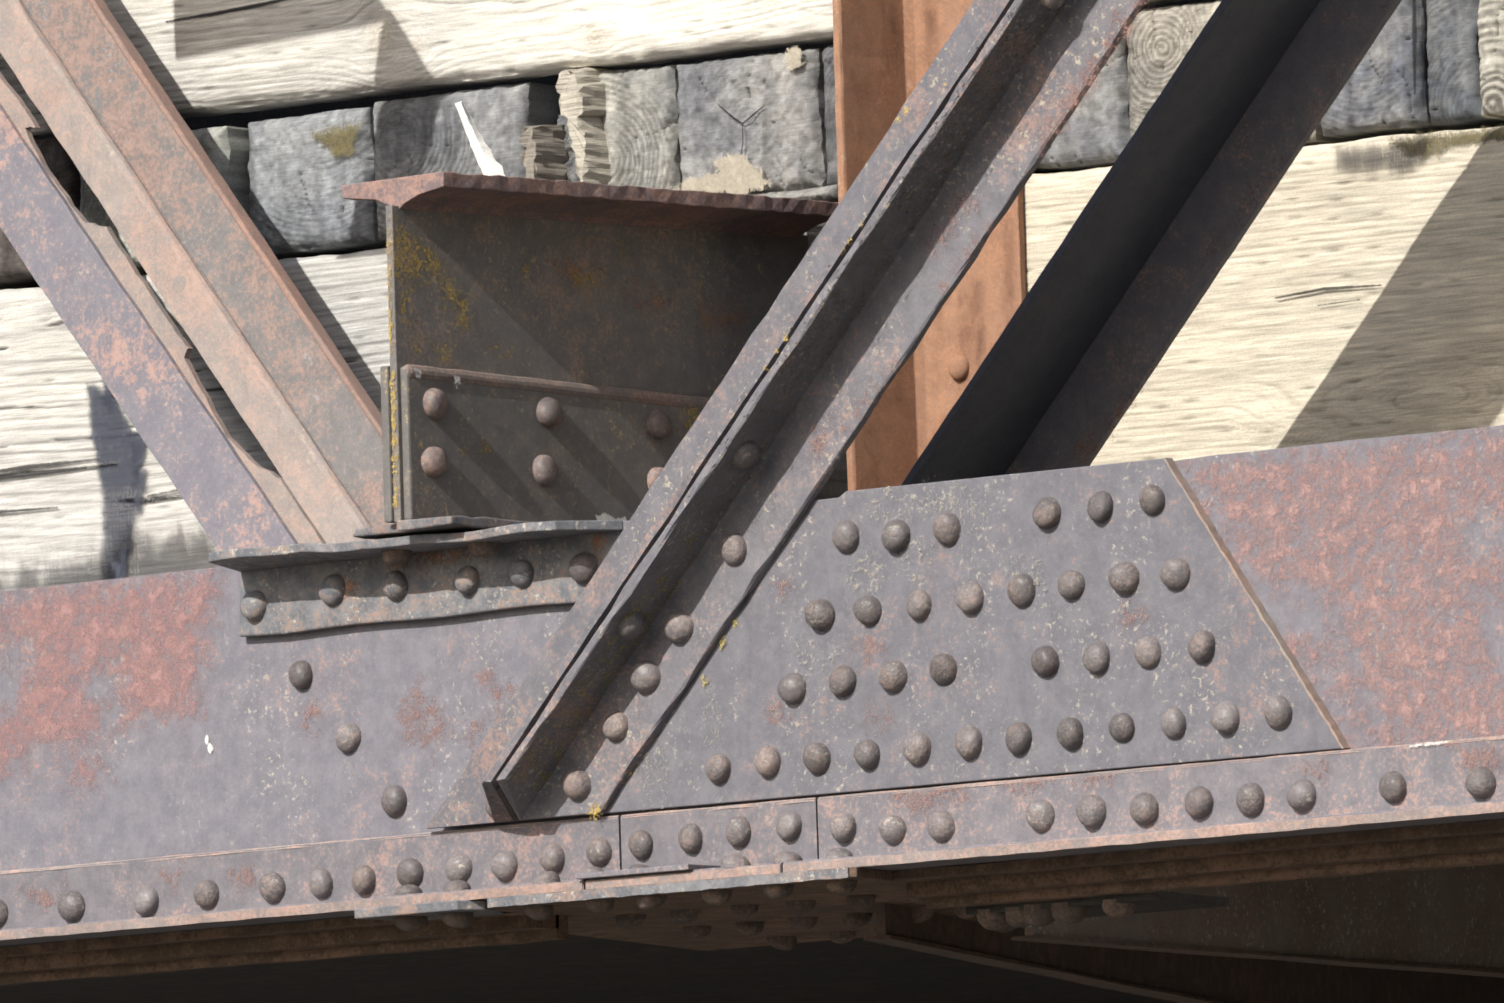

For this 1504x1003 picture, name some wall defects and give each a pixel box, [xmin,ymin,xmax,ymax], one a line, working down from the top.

rust [0,71,326,543]
rust [1185,427,1504,778]